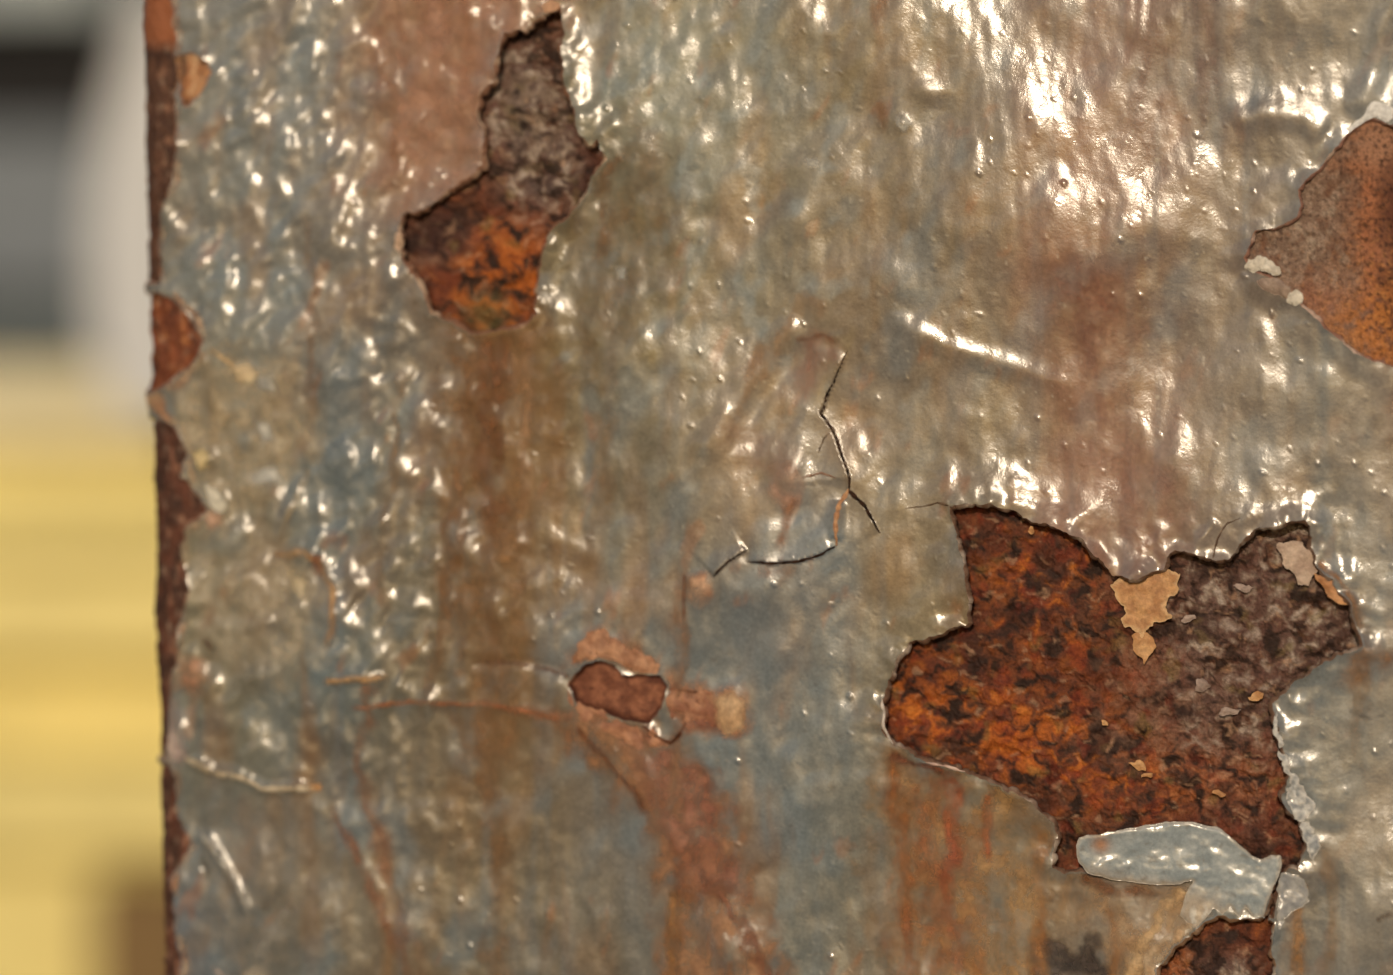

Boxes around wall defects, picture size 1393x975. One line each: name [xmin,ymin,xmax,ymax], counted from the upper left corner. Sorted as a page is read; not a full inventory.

peeling [143,0,274,393]
peeling [394,0,607,335]
peeling [1244,101,1393,367]
peeling [149,416,226,975]
peeling [252,467,280,483]
peeling [276,549,336,638]
peeling [567,628,746,749]
rust [675,573,712,641]
rust [668,675,746,737]
crack [713,350,881,577]
crack [905,501,948,509]
peeling [880,503,1363,975]